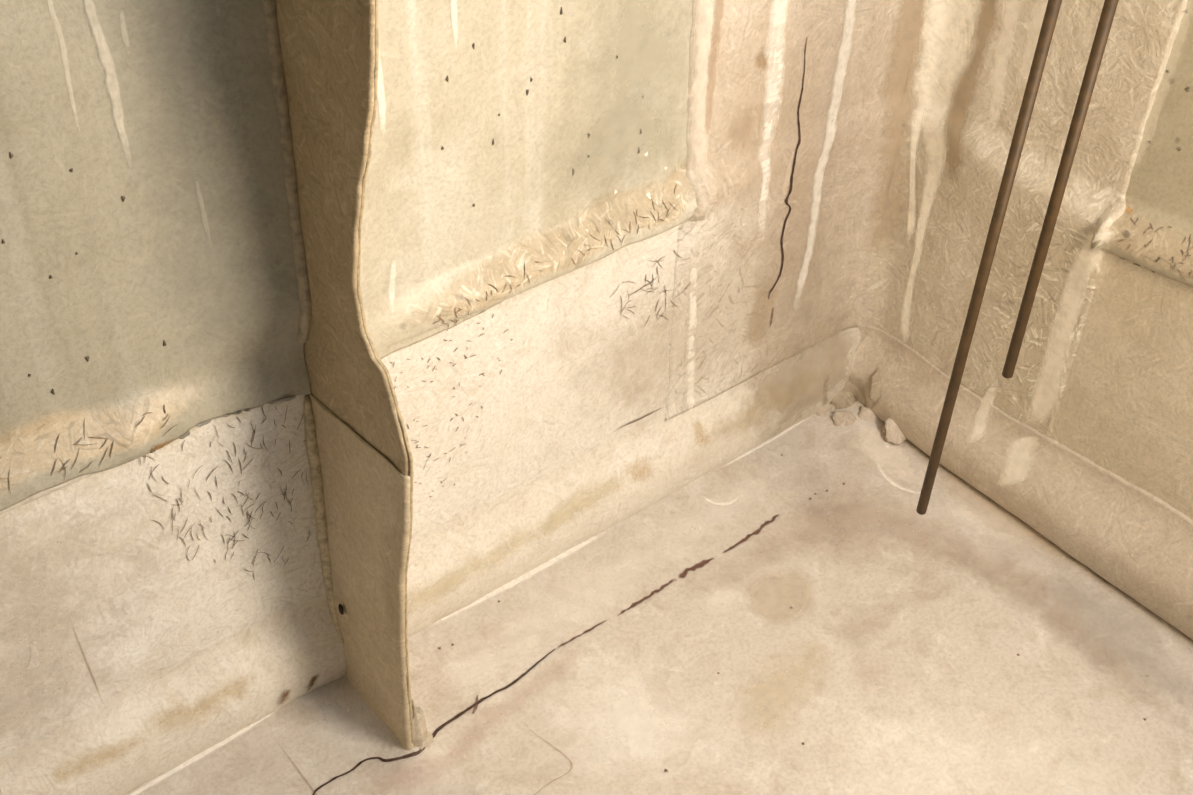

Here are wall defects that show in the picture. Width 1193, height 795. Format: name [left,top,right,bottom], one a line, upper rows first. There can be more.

leakage [85,0,127,144]
leakage [759,0,787,221]
crack [768,37,808,327]
leakage [799,0,855,289]
crack [313,515,778,795]